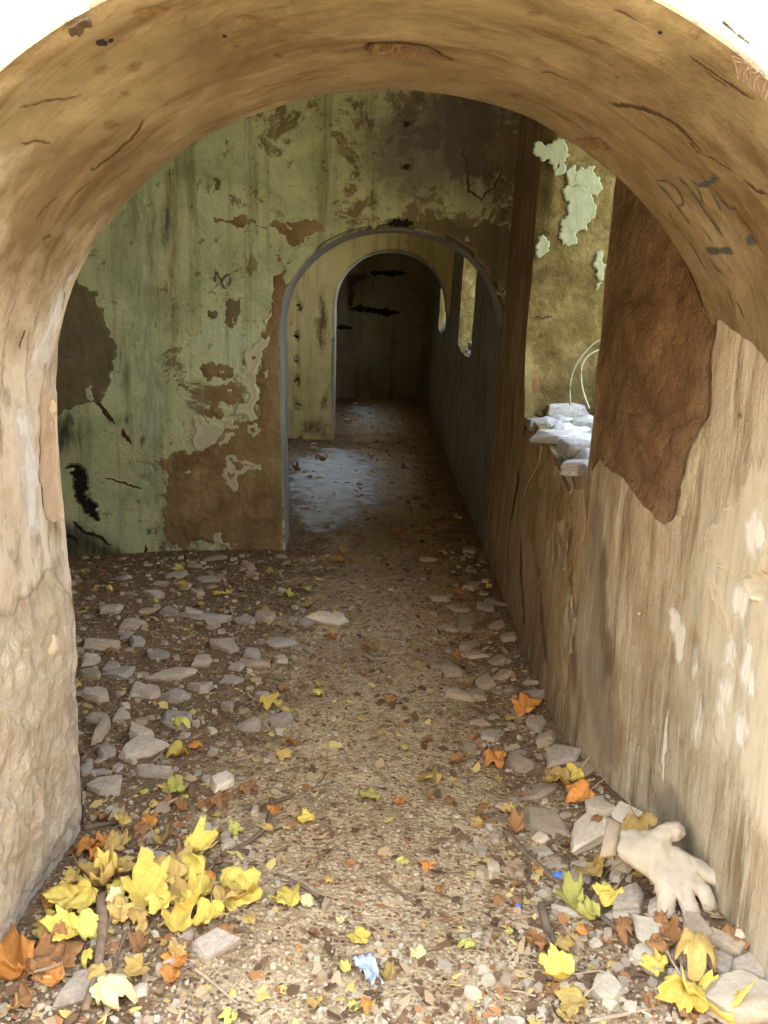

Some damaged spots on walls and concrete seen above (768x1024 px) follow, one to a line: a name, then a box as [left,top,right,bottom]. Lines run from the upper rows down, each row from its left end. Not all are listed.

flaking render [365,42,454,62]
crack [461,145,503,202]
peeling [214,215,323,247]
flaking render [533,138,716,525]
peeling [39,278,118,523]
peeling [160,255,291,550]
crack [65,463,142,546]